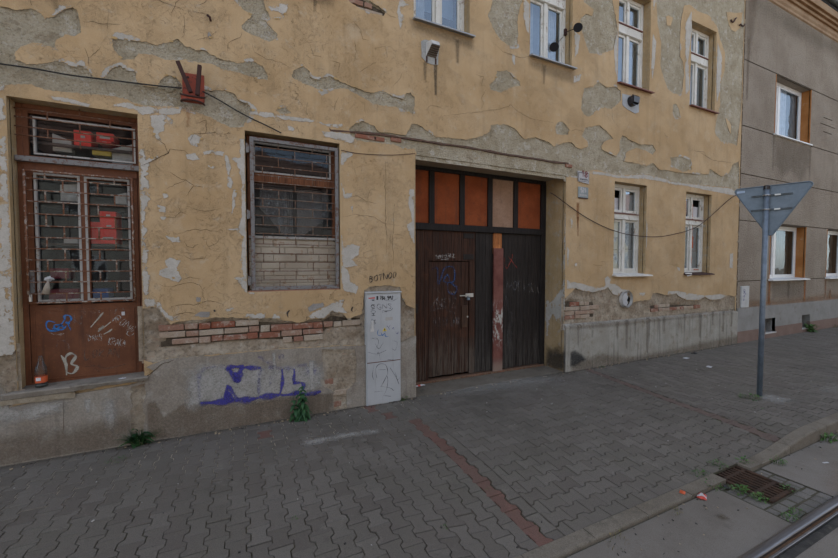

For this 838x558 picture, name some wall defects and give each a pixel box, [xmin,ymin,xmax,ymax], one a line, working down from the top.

spalling [0,0,746,196]
peeling [0,136,25,393]
flaking render [137,133,416,363]
flaking render [545,214,735,335]